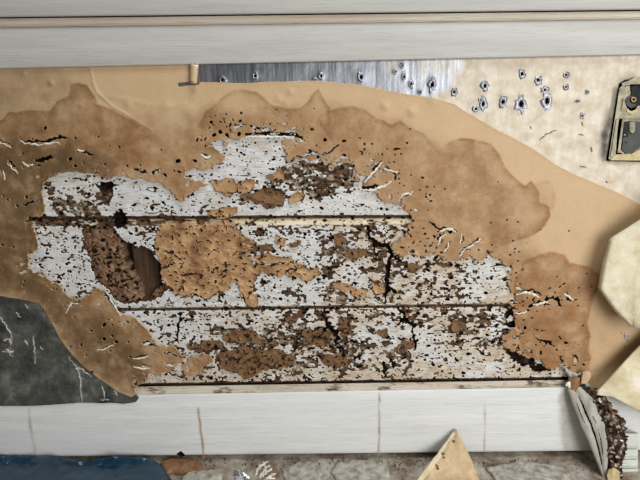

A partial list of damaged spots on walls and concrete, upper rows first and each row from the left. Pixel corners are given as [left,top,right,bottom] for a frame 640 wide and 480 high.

damp [0,145,90,218]
peeling [28,122,419,217]
damp [0,223,54,302]
peeling [17,225,578,388]
crack [322,308,345,356]
crack [366,228,417,351]